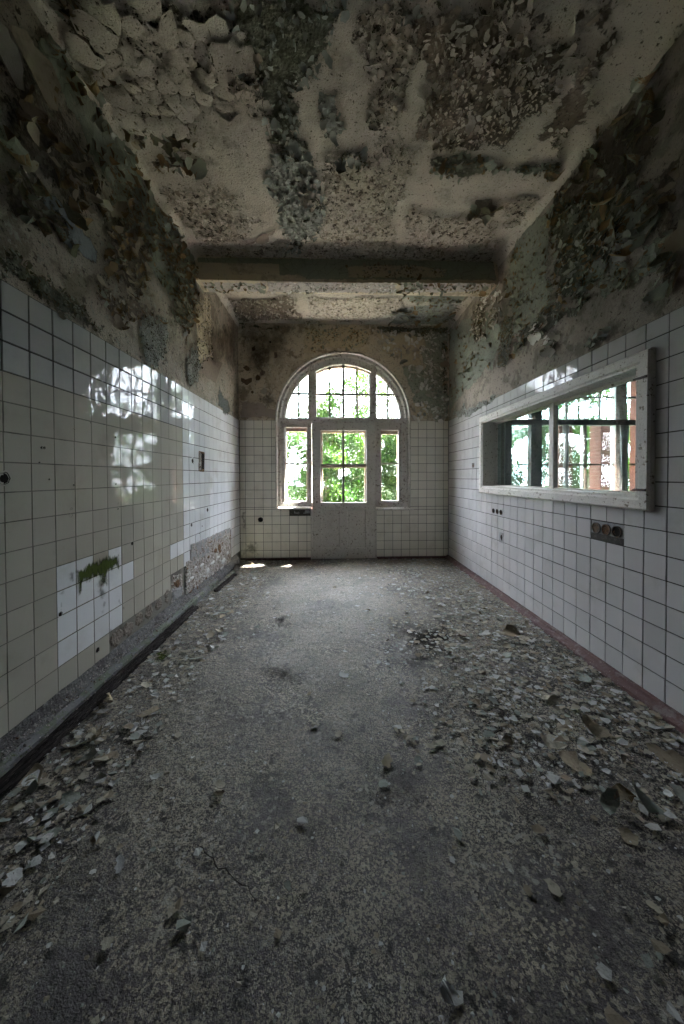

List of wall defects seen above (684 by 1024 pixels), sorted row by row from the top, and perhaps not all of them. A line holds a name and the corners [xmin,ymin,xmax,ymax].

peeling [0,0,684,423]
flaking render [109,528,231,648]